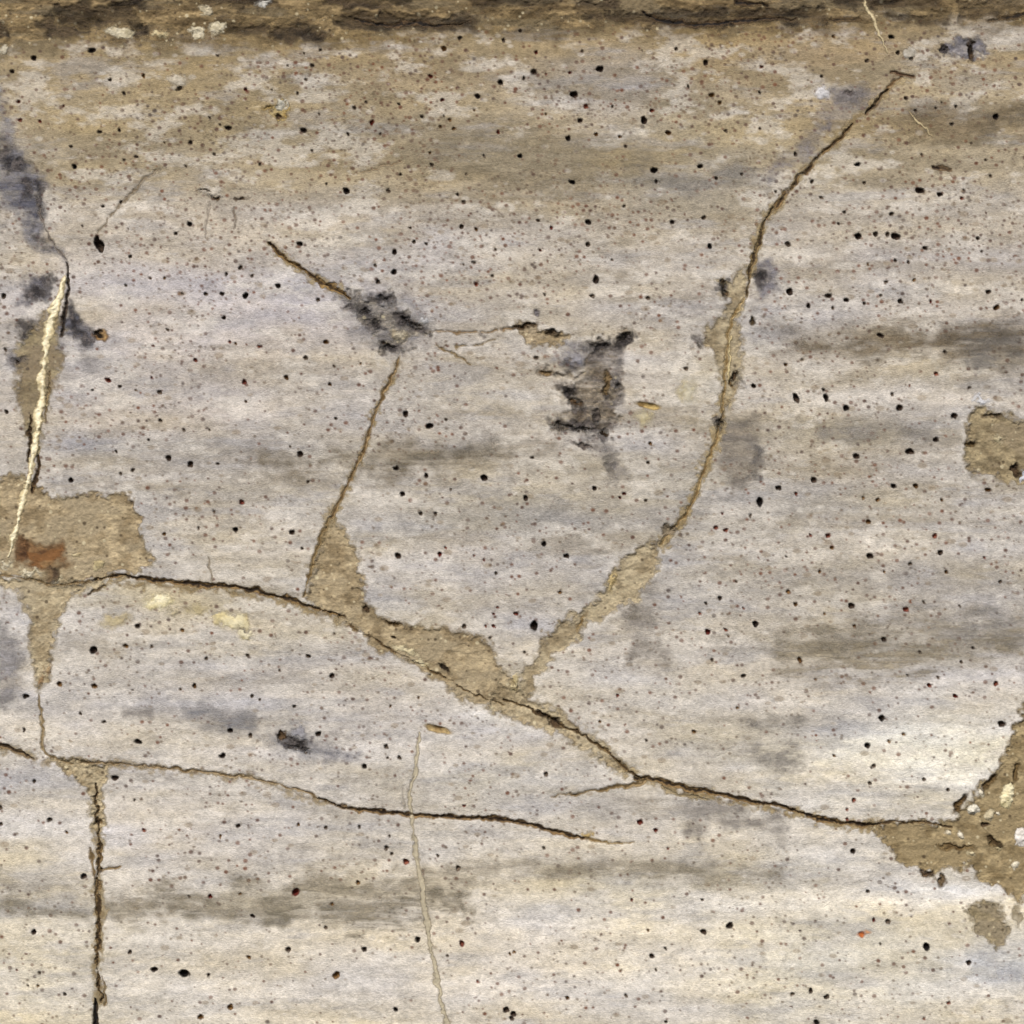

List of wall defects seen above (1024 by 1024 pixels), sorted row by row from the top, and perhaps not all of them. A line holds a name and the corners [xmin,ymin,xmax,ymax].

crack [97,168,161,233]
crack [658,0,916,553]
crack [909,111,932,136]
crack [932,164,952,172]
spalling [0,472,156,690]
spalling [144,595,178,616]
spalling [192,605,252,640]
crack [0,202,953,834]
spalling [302,520,665,774]
spalling [963,393,1024,487]
crack [0,695,633,1024]
spalling [863,703,1024,951]